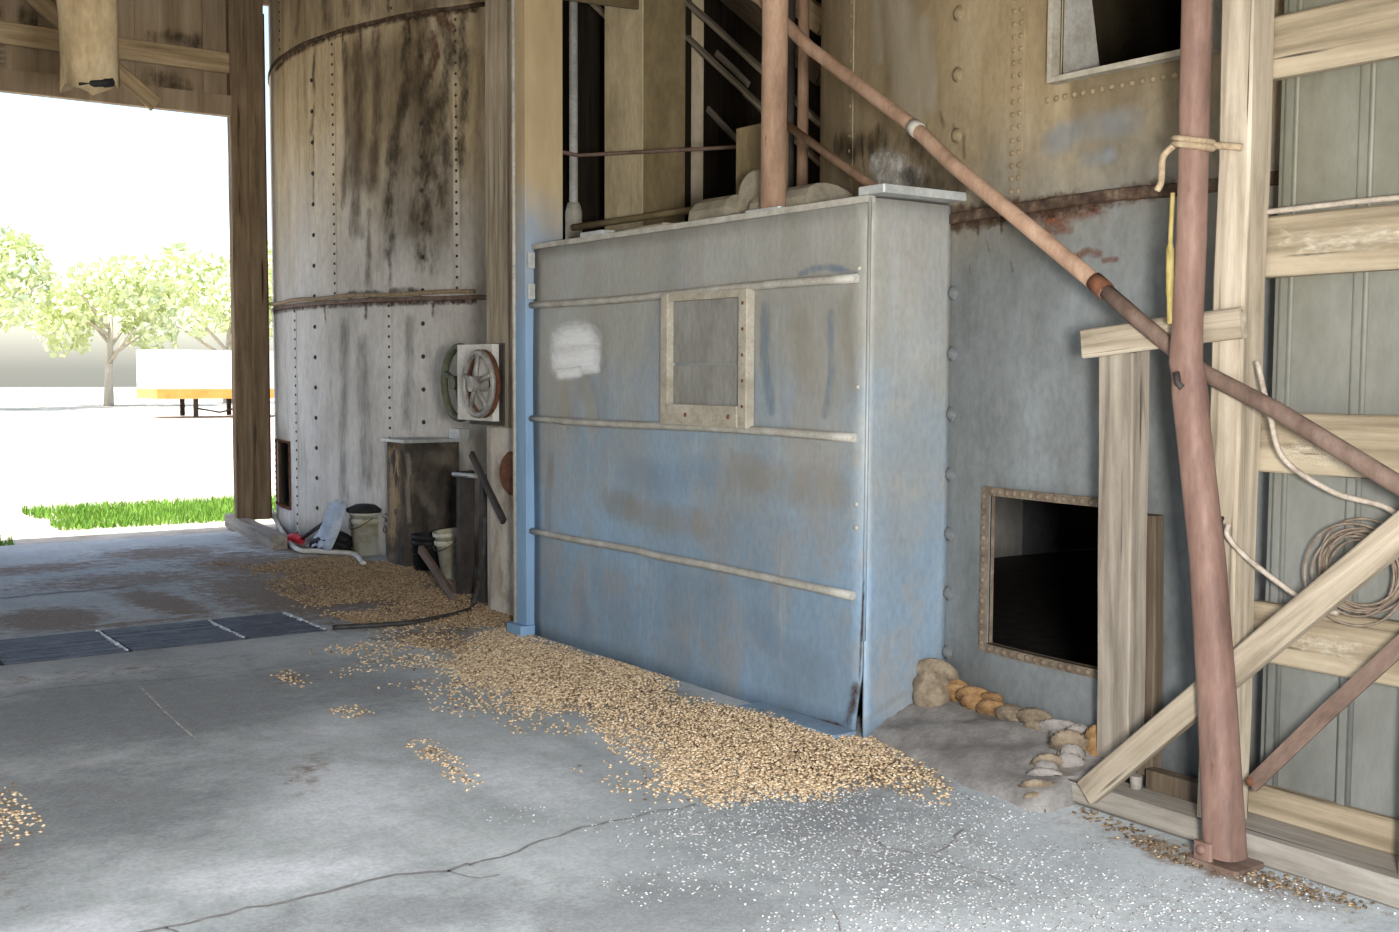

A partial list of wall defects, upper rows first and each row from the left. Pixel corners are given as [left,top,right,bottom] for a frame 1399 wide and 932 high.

leakage [342,14,468,257]
corrosion [950,181,1171,234]
crack [138,803,698,932]